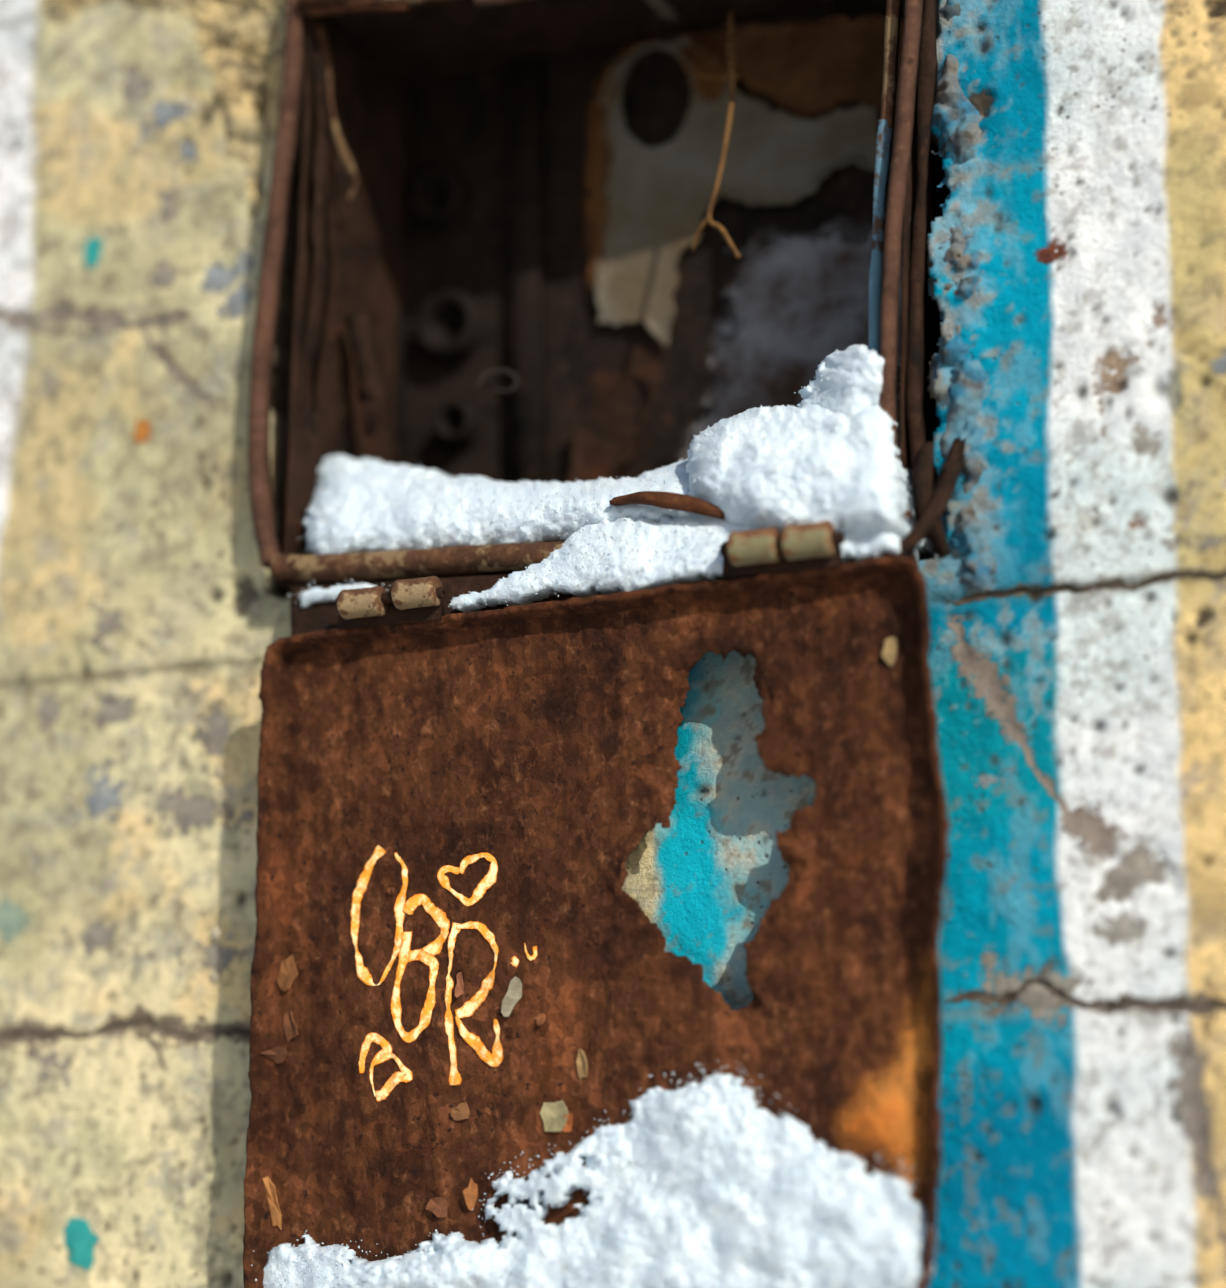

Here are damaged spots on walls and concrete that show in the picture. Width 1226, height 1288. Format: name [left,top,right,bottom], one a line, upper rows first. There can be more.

spalling [38,0,105,27]
spalling [937,0,961,37]
spalling [120,0,287,319]
spalling [931,54,994,208]
crack [0,285,217,406]
spalling [927,226,997,591]
crack [0,1002,250,1068]
crack [946,958,1226,1275]